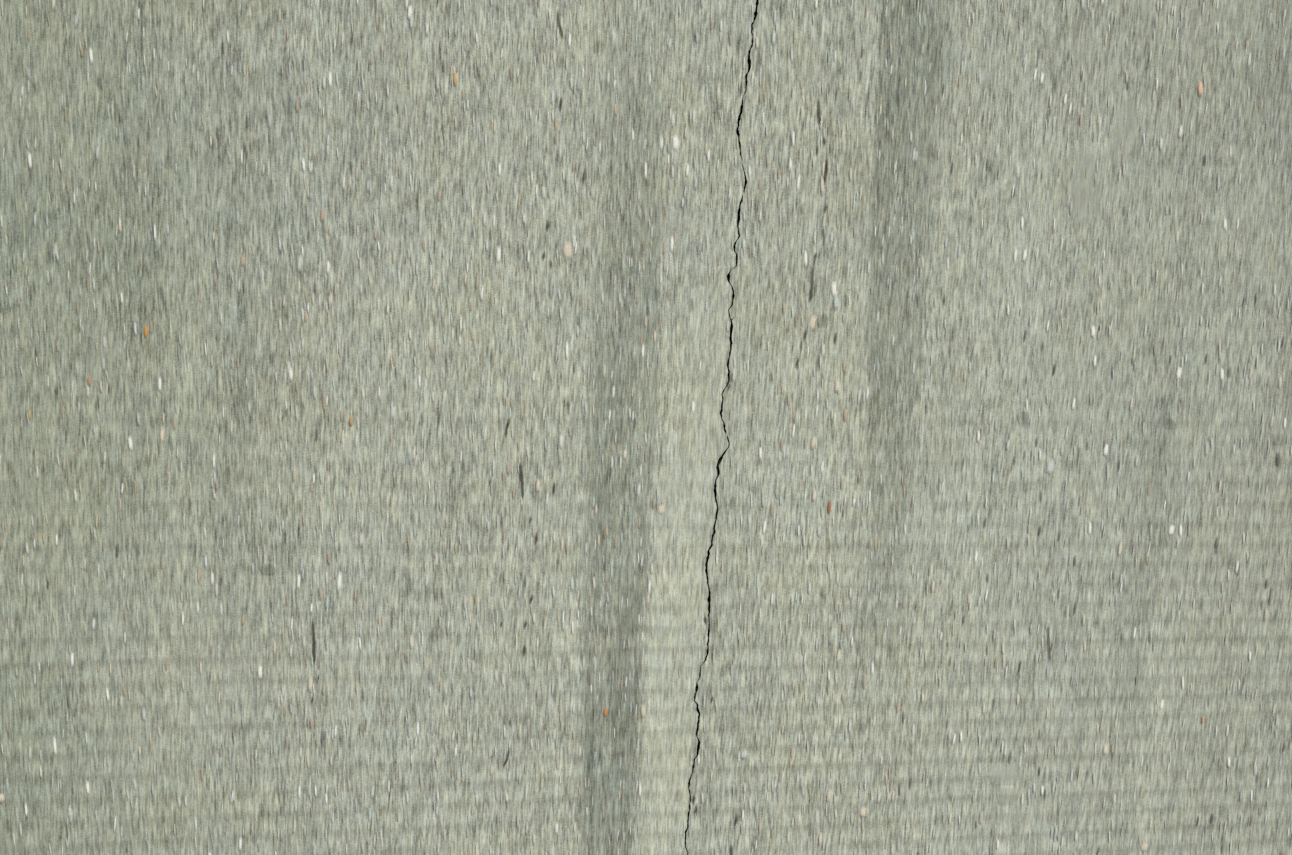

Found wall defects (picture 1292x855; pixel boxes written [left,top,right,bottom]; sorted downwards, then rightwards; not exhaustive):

crack [685,0,759,855]